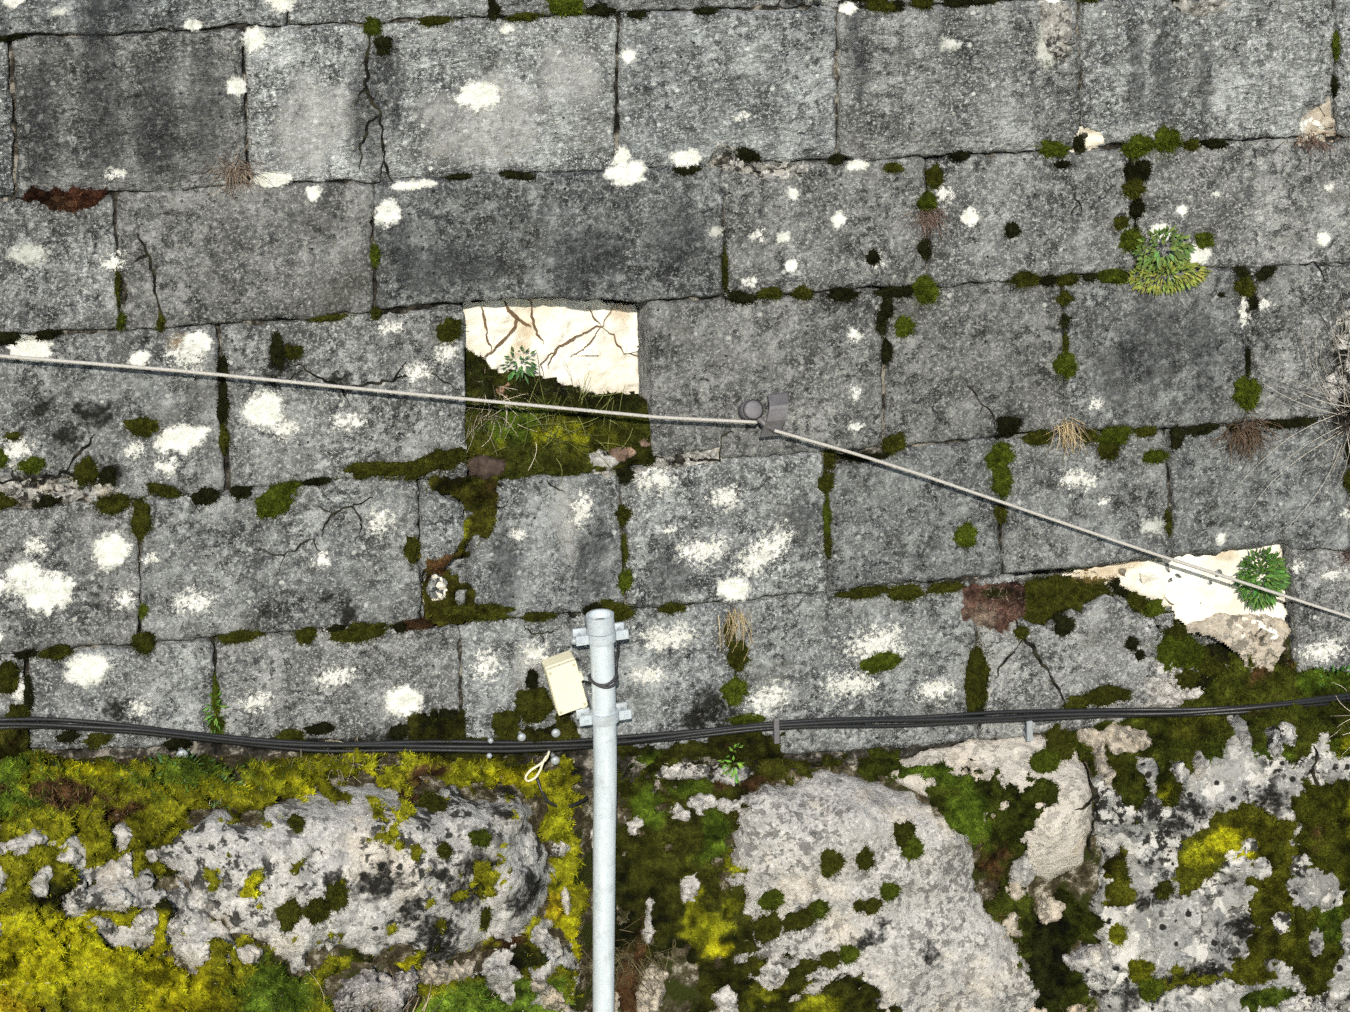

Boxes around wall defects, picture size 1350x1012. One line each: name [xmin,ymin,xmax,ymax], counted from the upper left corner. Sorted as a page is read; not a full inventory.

crack [354,34,393,182]
spalling [462,298,639,395]
crack [481,299,639,377]
crack [995,619,1066,704]
spalling [1044,601,1094,631]
spalling [1062,545,1291,673]